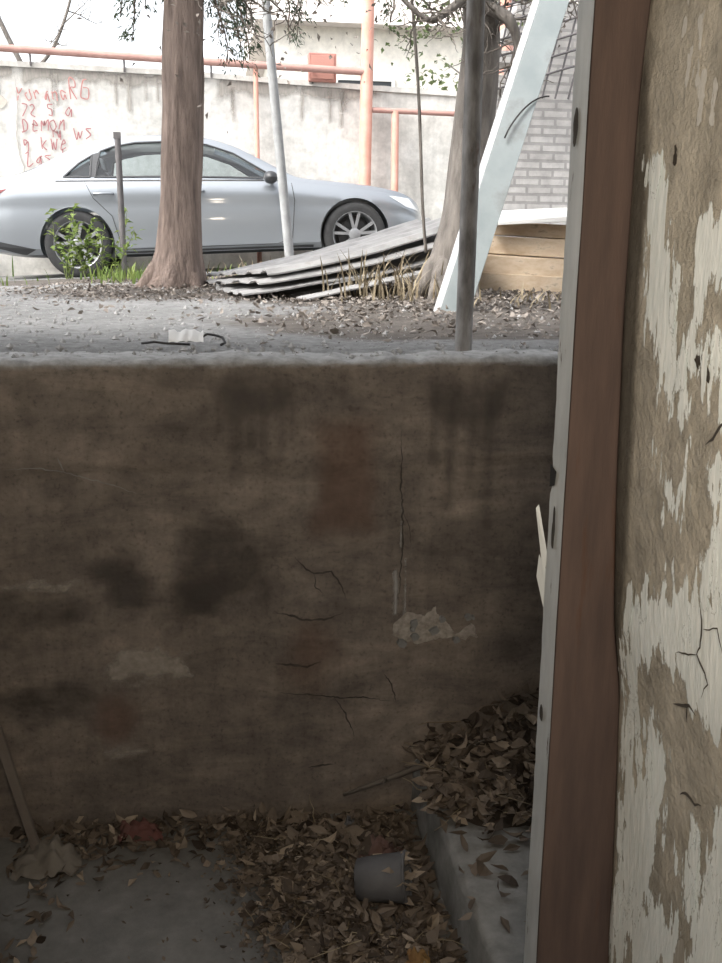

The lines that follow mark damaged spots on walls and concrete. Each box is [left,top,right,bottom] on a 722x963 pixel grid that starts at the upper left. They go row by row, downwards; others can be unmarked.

peeling [642,145,722,535]
crack [398,431,411,606]
crack [281,674,396,735]
spalling [392,606,478,648]
peeling [608,449,722,963]
crack [674,608,722,721]